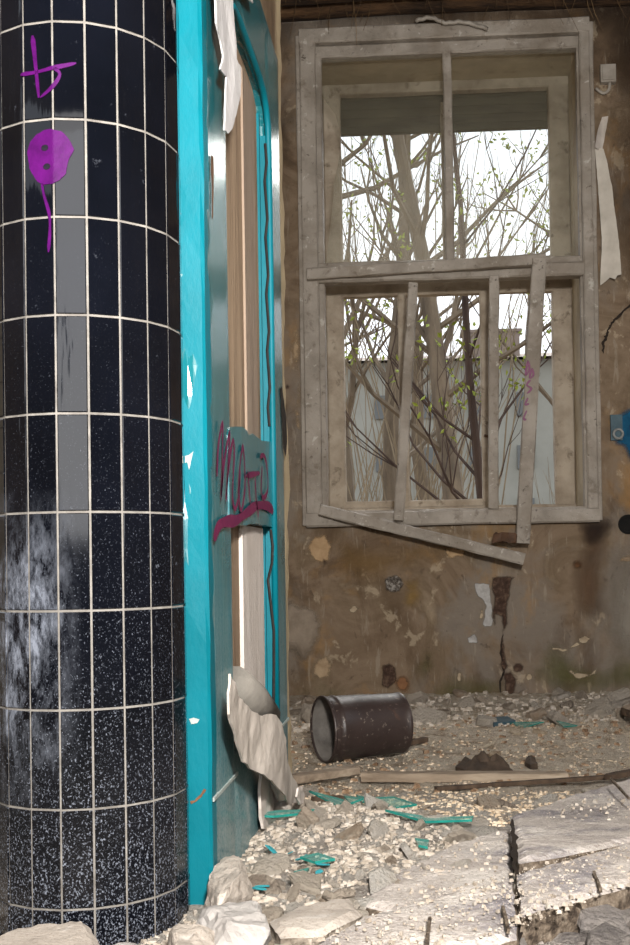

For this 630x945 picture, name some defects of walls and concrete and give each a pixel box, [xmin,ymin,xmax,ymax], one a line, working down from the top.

peeling [214,0,241,134]
crack [601,305,630,353]
flaking render [475,576,513,628]
flaking render [288,603,331,678]
crack [498,635,506,693]
flaking render [500,640,532,694]
flaking render [258,774,278,830]
crack [510,819,519,873]
crack [515,904,523,945]